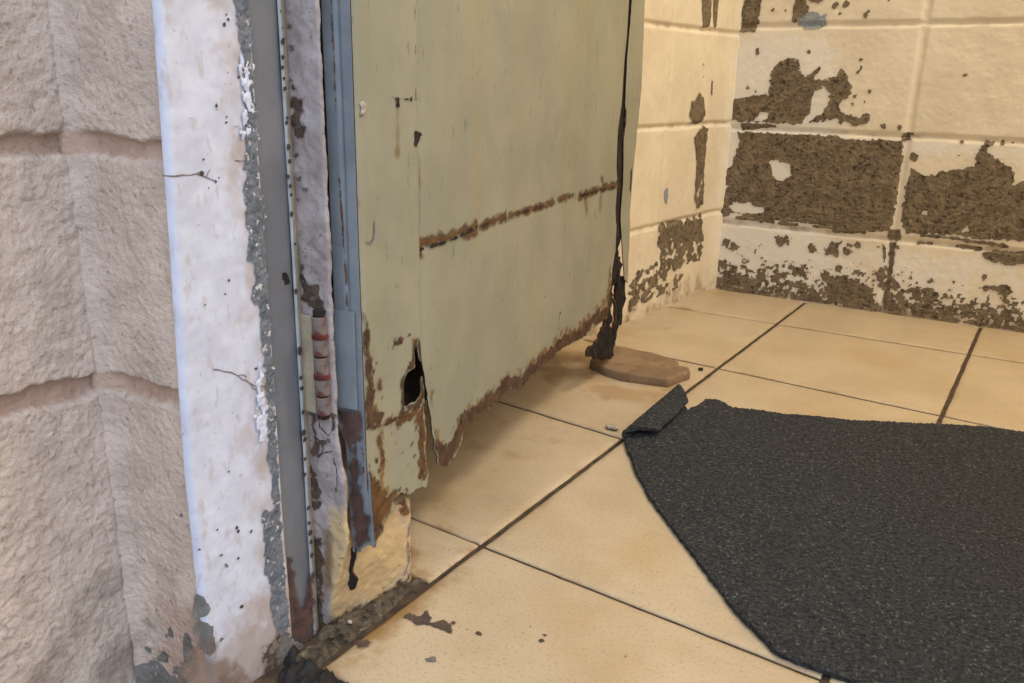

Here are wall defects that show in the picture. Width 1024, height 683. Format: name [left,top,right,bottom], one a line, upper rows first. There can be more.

rust [419,109,632,258]
peeling [628,63,713,312]
peeling [716,50,1024,333]
rust [337,274,611,548]
peeling [134,594,224,683]